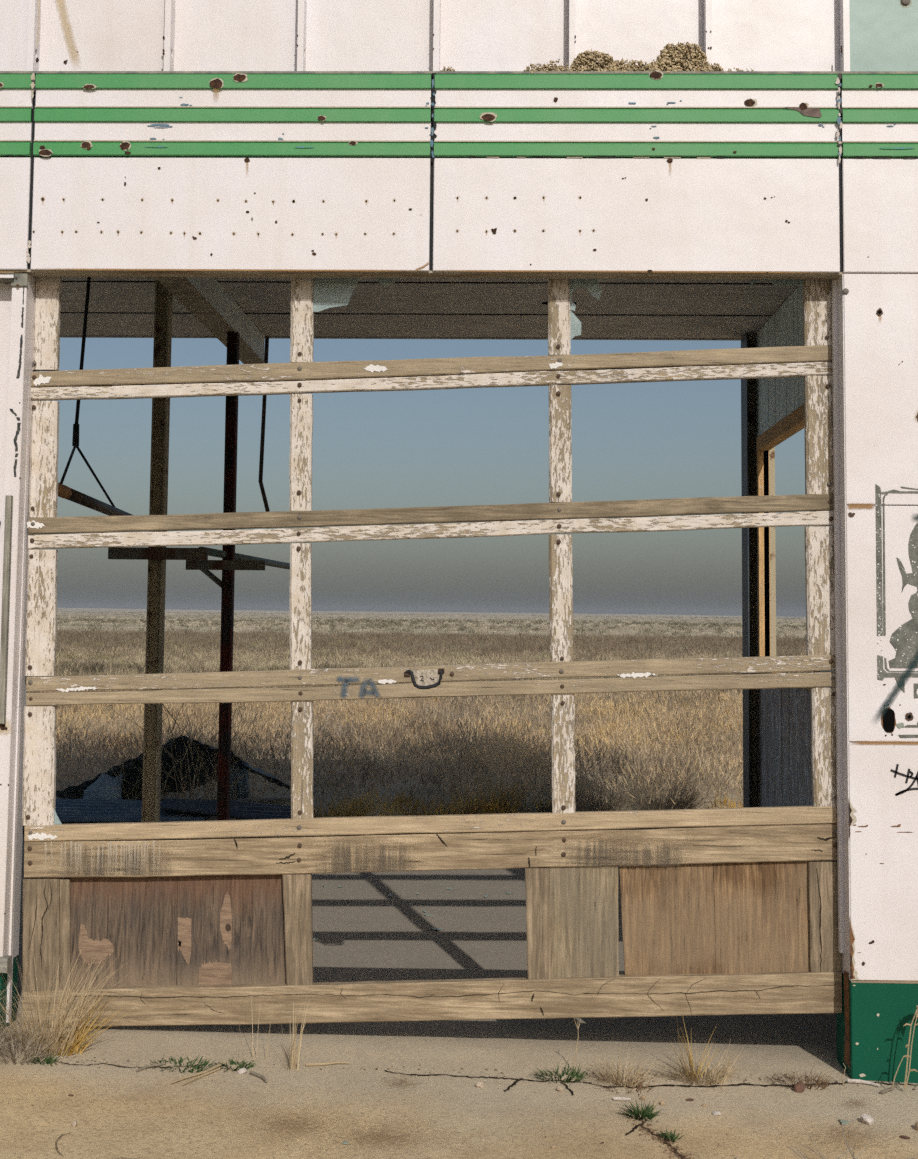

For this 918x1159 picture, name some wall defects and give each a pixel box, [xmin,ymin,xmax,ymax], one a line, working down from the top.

rust [209,73,248,89]
rust [480,112,497,122]
rust [39,146,53,157]
crack [385,1070,918,1095]
crack [626,1116,690,1159]